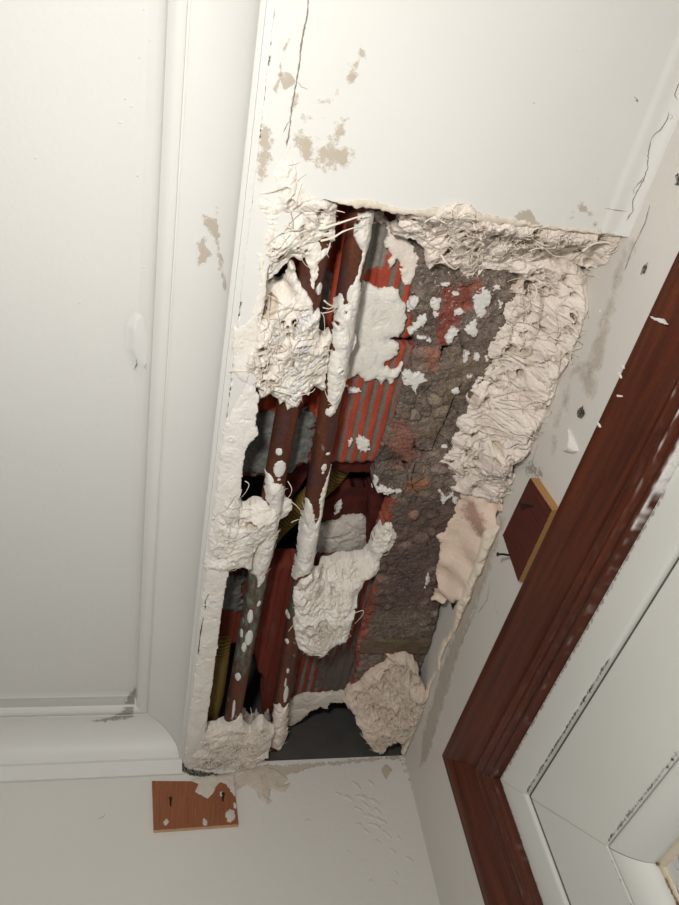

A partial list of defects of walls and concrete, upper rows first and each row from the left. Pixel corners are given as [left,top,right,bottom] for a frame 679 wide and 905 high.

crack [284,0,309,145]
flaking render [335,199,617,236]
crack [625,84,679,268]
flaking render [212,253,267,520]
flaking render [184,566,229,768]